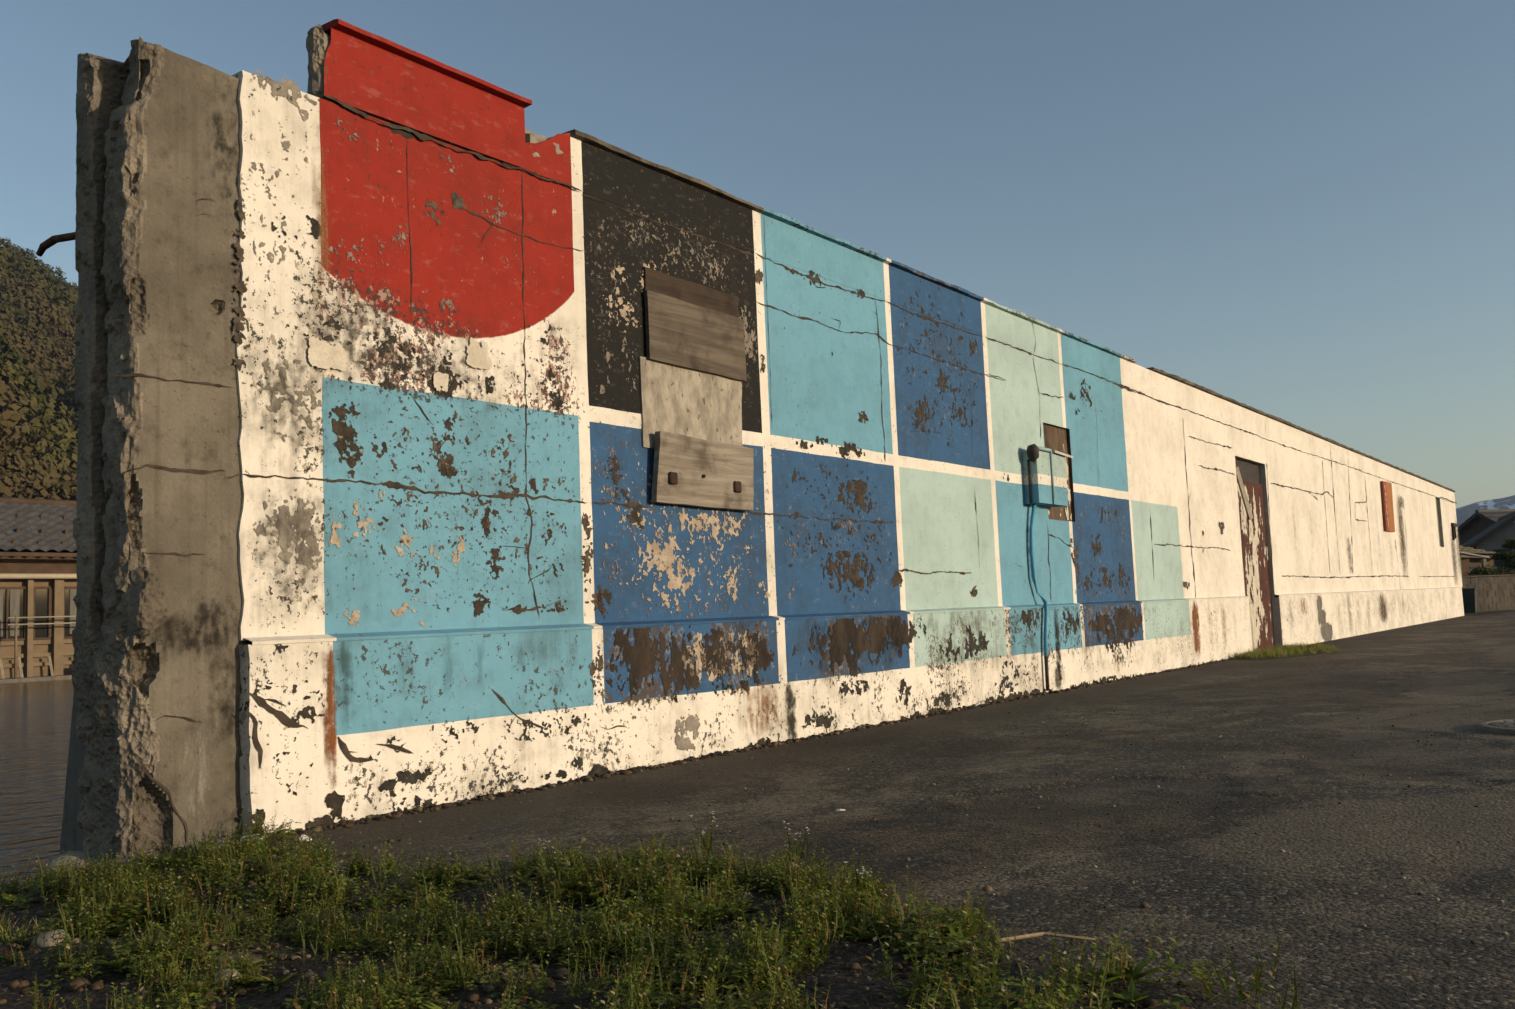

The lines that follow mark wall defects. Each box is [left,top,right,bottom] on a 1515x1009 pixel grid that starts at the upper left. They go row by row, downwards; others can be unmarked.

crack [117,95,1457,619]
peeling [233,135,914,751]
spalling [128,474,143,549]
peeling [1048,445,1072,520]
peeling [1070,507,1147,654]
spalling [129,642,160,697]
rust [325,650,337,782]
spalling [893,708,945,722]
spalling [972,689,1052,706]
spalling [1070,674,1142,688]
spalling [131,769,173,862]